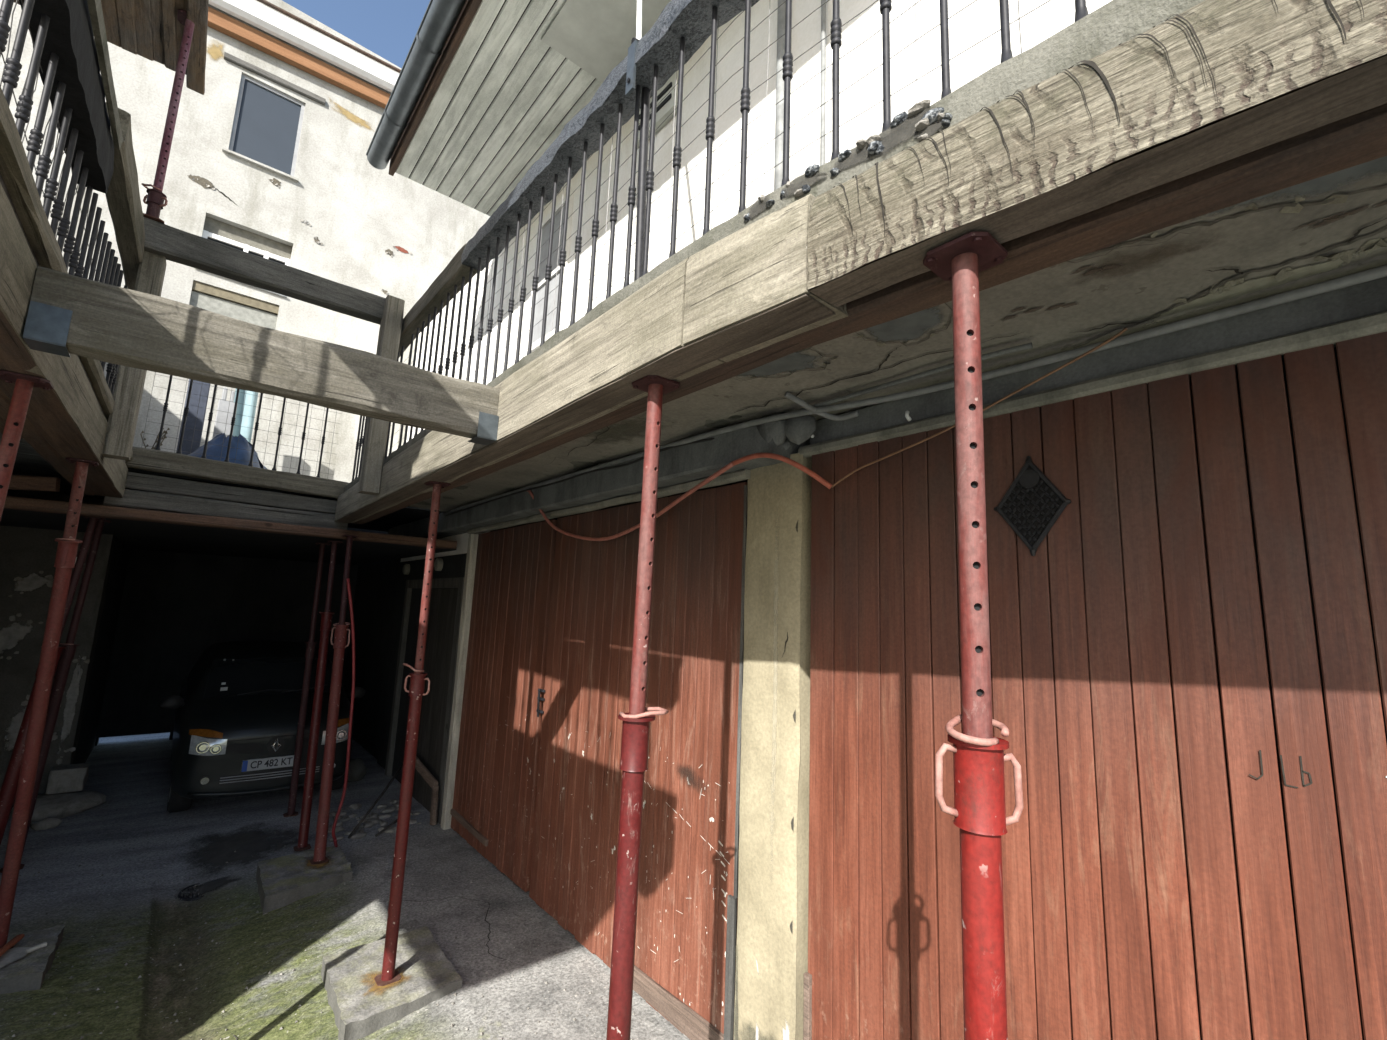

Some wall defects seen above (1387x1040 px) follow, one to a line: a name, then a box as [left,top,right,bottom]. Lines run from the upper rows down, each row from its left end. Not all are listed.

flaking render [854,303,953,347]
crack [1071,218,1387,348]
flaking render [0,571,54,660]
damp [185,824,299,898]